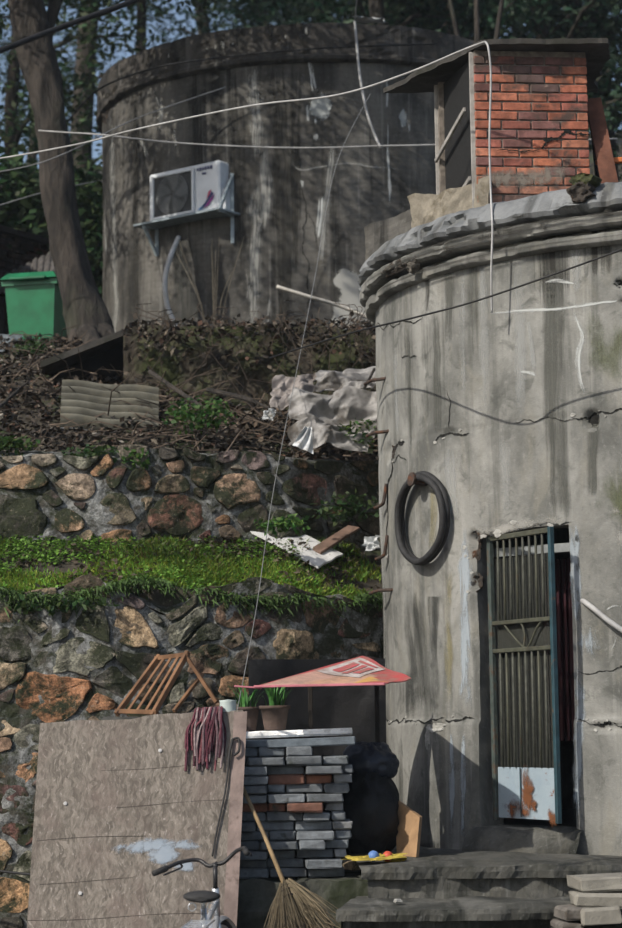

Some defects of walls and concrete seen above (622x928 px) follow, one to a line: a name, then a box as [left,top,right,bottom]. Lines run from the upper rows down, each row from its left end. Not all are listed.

peeling [306,62,332,123]
water stain [188,78,204,165]
crack [497,129,589,153]
water stain [231,66,391,323]
water stain [371,202,622,505]
crack [433,391,468,444]
crack [516,408,622,427]
crack [386,715,474,725]
crack [575,718,622,732]
corrosion [508,772,536,818]